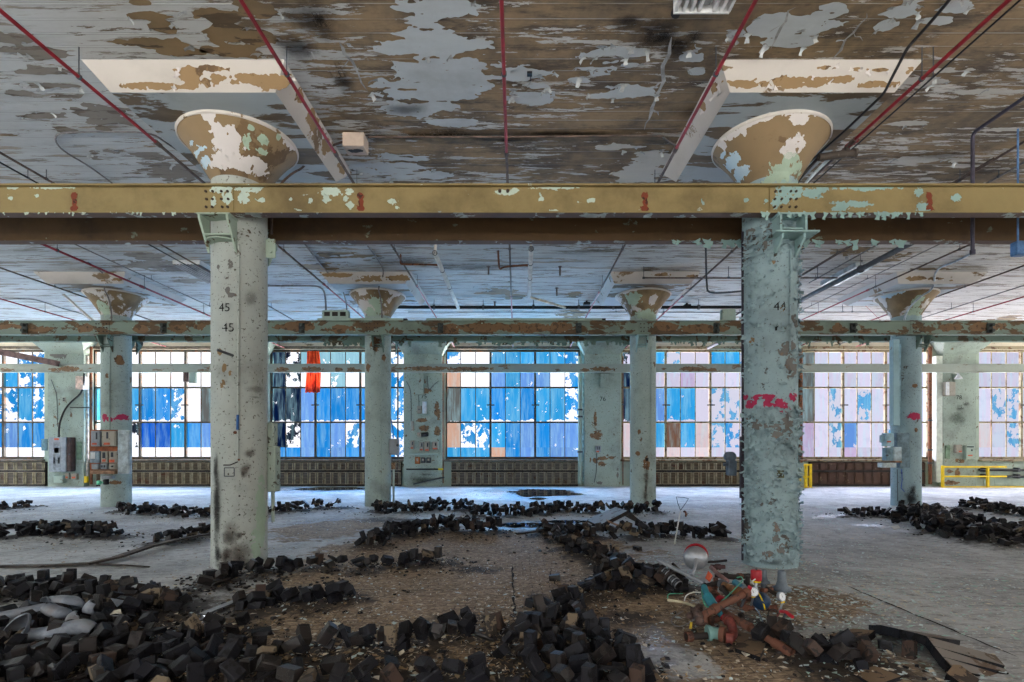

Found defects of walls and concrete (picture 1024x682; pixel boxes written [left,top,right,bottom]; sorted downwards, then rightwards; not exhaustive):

peeling [0,31,137,134]
peeling [107,0,333,161]
peeling [367,0,660,128]
peeling [725,2,849,58]
peeling [699,63,999,115]
peeling [873,0,975,34]
corrosion [70,192,78,211]
peeling [87,113,295,207]
corrosion [357,192,365,211]
peeling [289,152,454,211]
peeling [623,112,959,566]
damp [214,459,244,561]